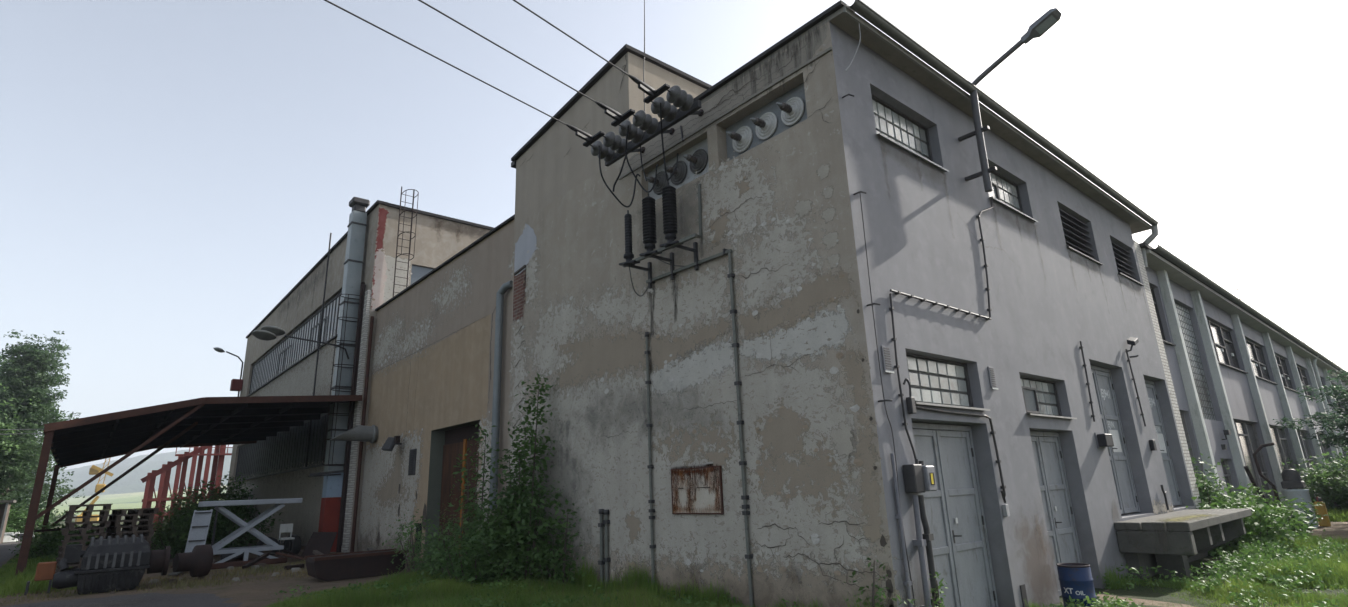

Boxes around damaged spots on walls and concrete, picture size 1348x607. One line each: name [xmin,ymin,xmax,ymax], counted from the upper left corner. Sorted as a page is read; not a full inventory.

peeling [371,144,909,607]
rust [672,467,721,513]
crack [756,521,880,587]